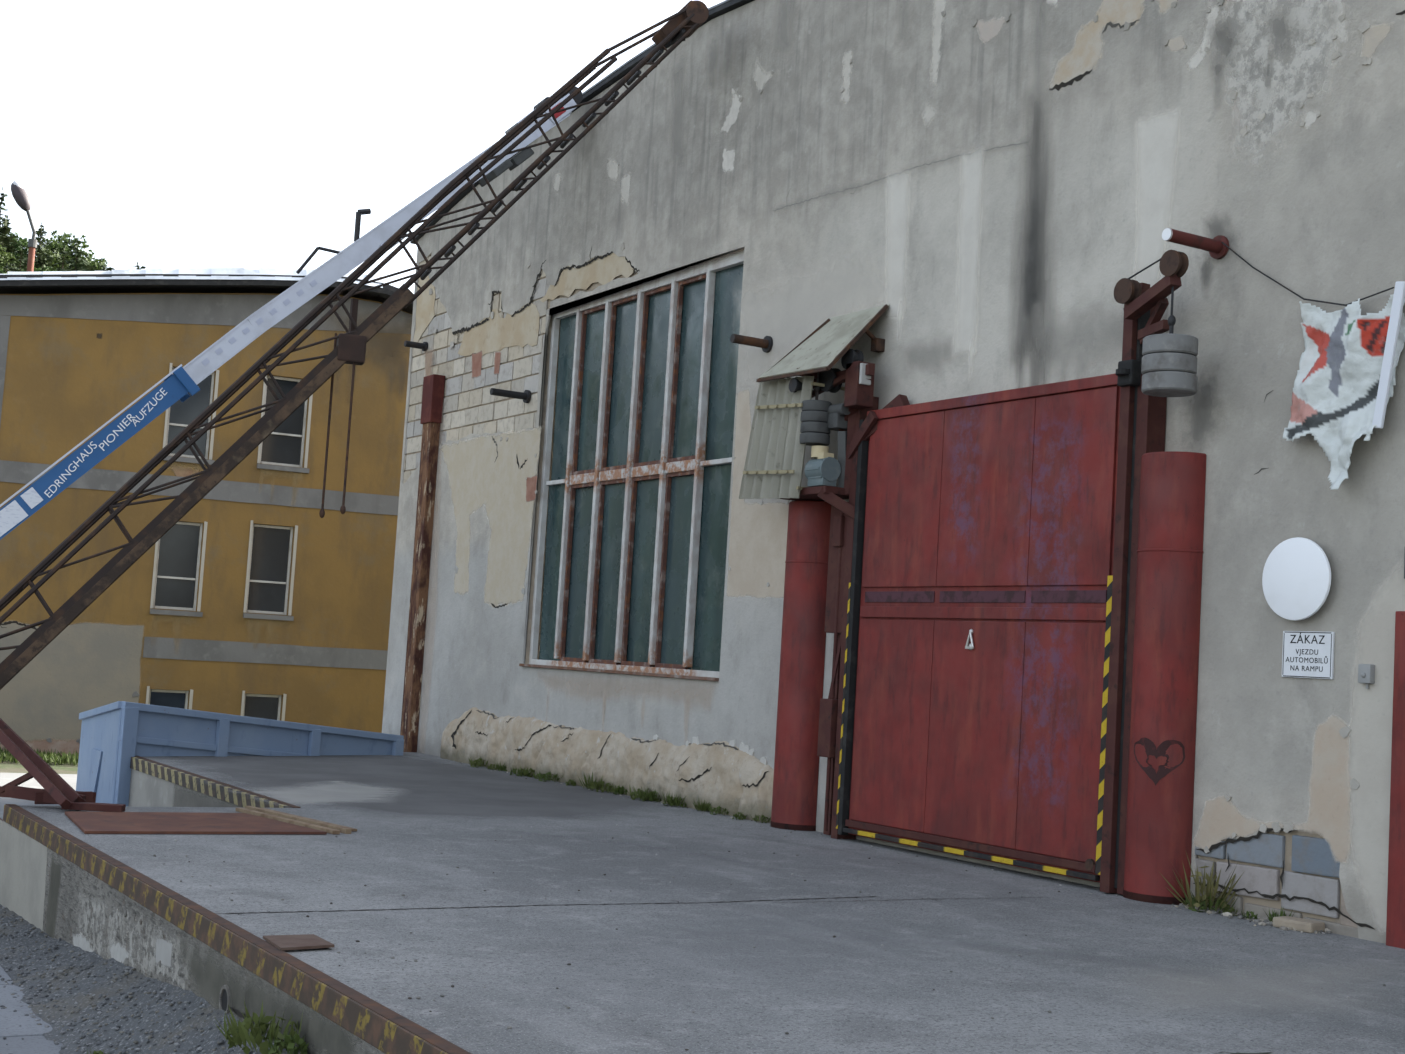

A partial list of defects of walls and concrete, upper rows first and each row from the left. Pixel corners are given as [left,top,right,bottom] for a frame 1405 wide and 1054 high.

peeling [721,61,774,171]
peeling [1049,0,1177,88]
water stain [1213,23,1234,82]
peeling [1163,0,1390,163]
water stain [1267,14,1289,78]
water stain [1014,98,1050,386]
spalling [403,242,634,606]
spalling [1195,716,1360,938]
crack [1214,1046,1272,1054]